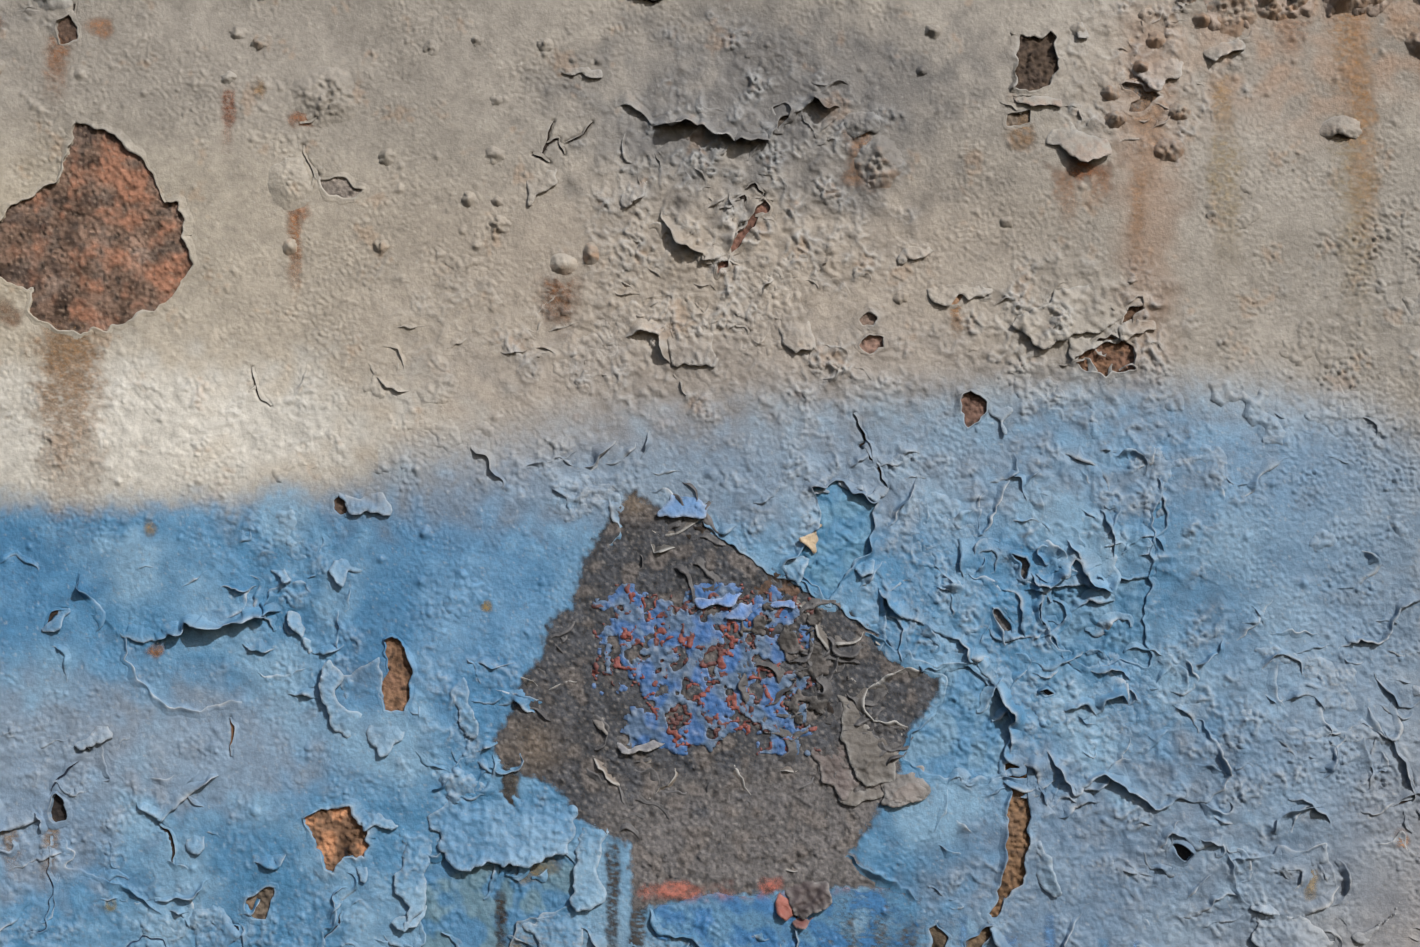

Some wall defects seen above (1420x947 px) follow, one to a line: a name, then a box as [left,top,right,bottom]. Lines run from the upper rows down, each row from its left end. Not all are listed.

peeling [999,1,1186,162]
rust [1100,85,1127,128]
rust [1133,30,1191,120]
rust [1153,137,1185,162]
peeling [1203,23,1259,61]
rust [0,114,200,428]
peeling [615,78,849,395]
peeling [751,252,888,381]
peeling [953,389,1013,435]
peeling [329,492,392,520]
peeling [119,532,645,947]
peeling [525,431,1420,947]